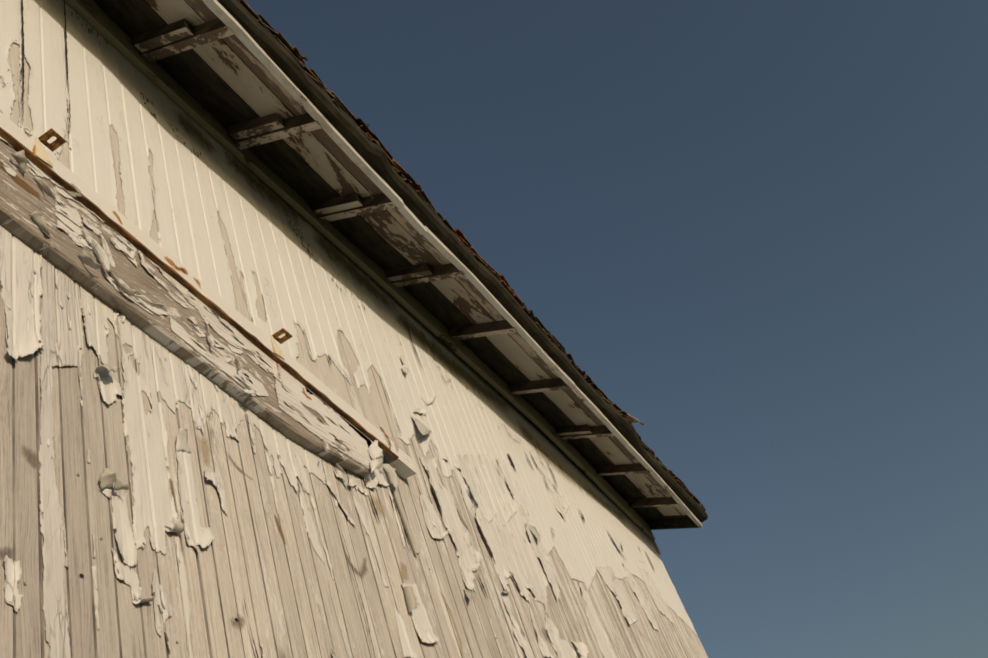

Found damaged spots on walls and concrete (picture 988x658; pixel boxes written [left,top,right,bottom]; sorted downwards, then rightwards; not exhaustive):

peeling [0,44,33,131]
peeling [0,122,419,658]
peeling [393,583,439,658]
peeling [419,454,617,658]
peeling [596,562,675,631]